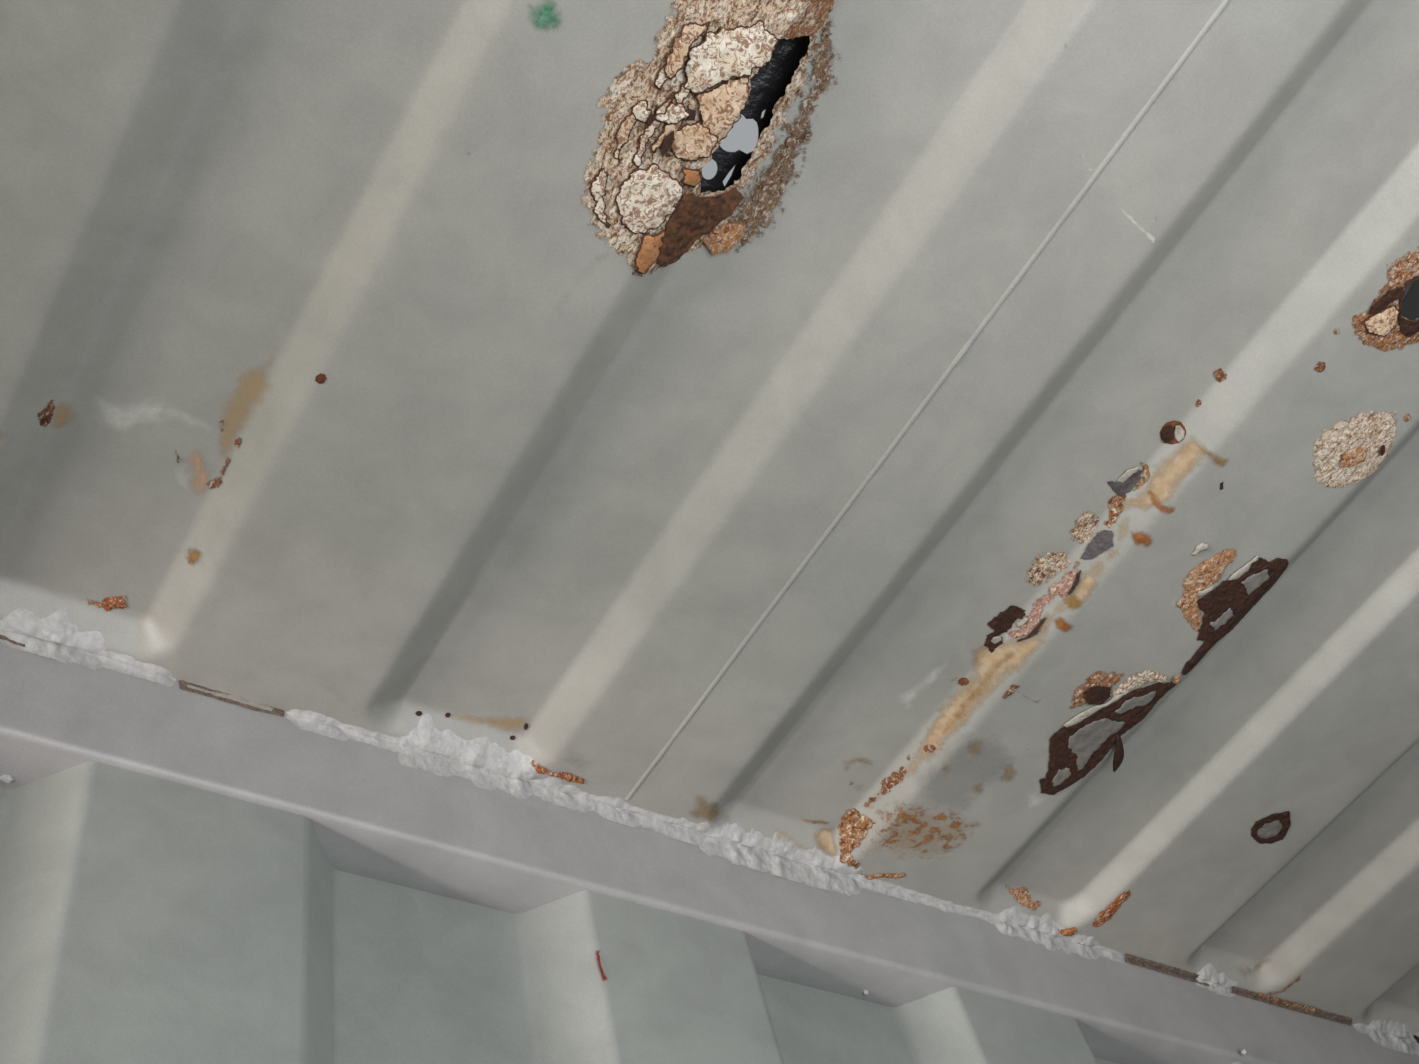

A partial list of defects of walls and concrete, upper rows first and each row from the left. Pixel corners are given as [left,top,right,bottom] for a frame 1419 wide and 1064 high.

peeling [589,20,778,275]
peeling [1361,305,1400,337]
peeling [984,462,1150,653]
rust [88,596,127,611]
rust [813,554,1112,880]
peeling [1062,669,1171,728]
rust [1040,548,1289,795]
rust [531,760,584,784]
peeling [1113,735,1124,772]
spalling [1251,811,1291,844]
rust [1058,891,1130,936]
rust [1125,953,1352,1026]